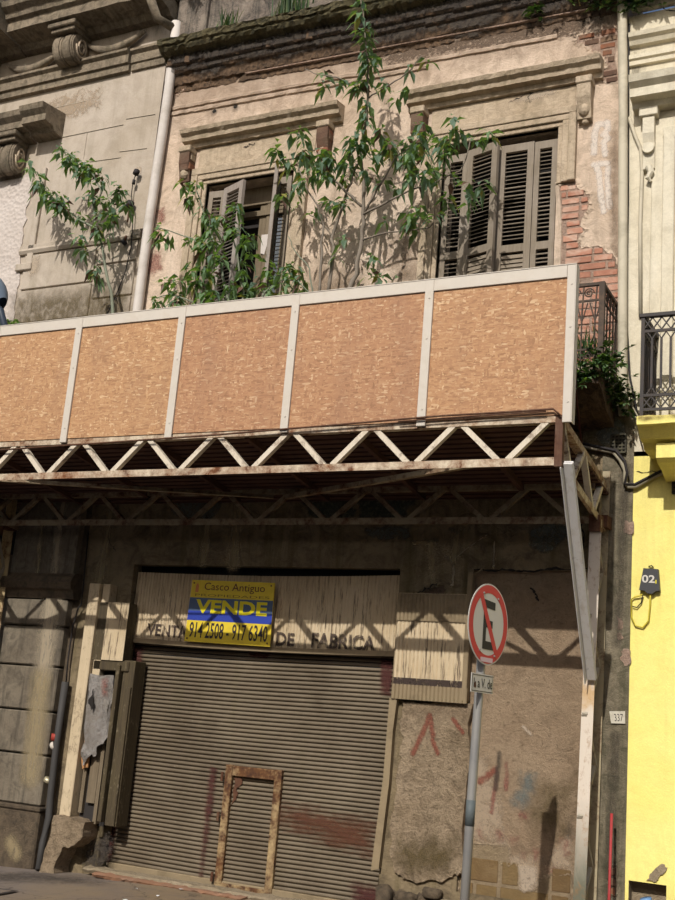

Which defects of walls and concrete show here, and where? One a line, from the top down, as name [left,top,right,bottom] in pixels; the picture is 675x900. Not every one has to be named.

leakage [170,0,568,74]
peeling [382,18,618,86]
spalling [555,176,618,369]
crack [474,524,588,573]